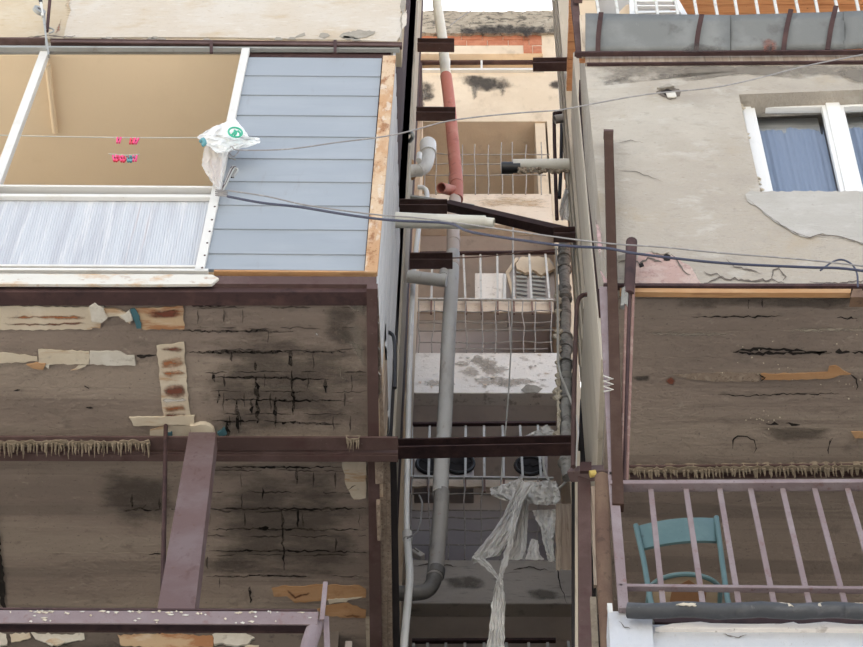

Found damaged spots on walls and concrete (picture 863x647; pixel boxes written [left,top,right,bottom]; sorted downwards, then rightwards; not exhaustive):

water stain [466,76,506,98]
crack [695,261,786,318]
peeling [0,303,185,331]
peeling [0,349,135,370]
peeling [129,342,227,436]
peeling [674,362,861,387]
crack [719,347,863,397]
water stain [0,442,150,459]
water stain [629,467,863,480]
crack [206,466,367,603]
crack [0,542,8,608]
peeling [272,584,366,618]